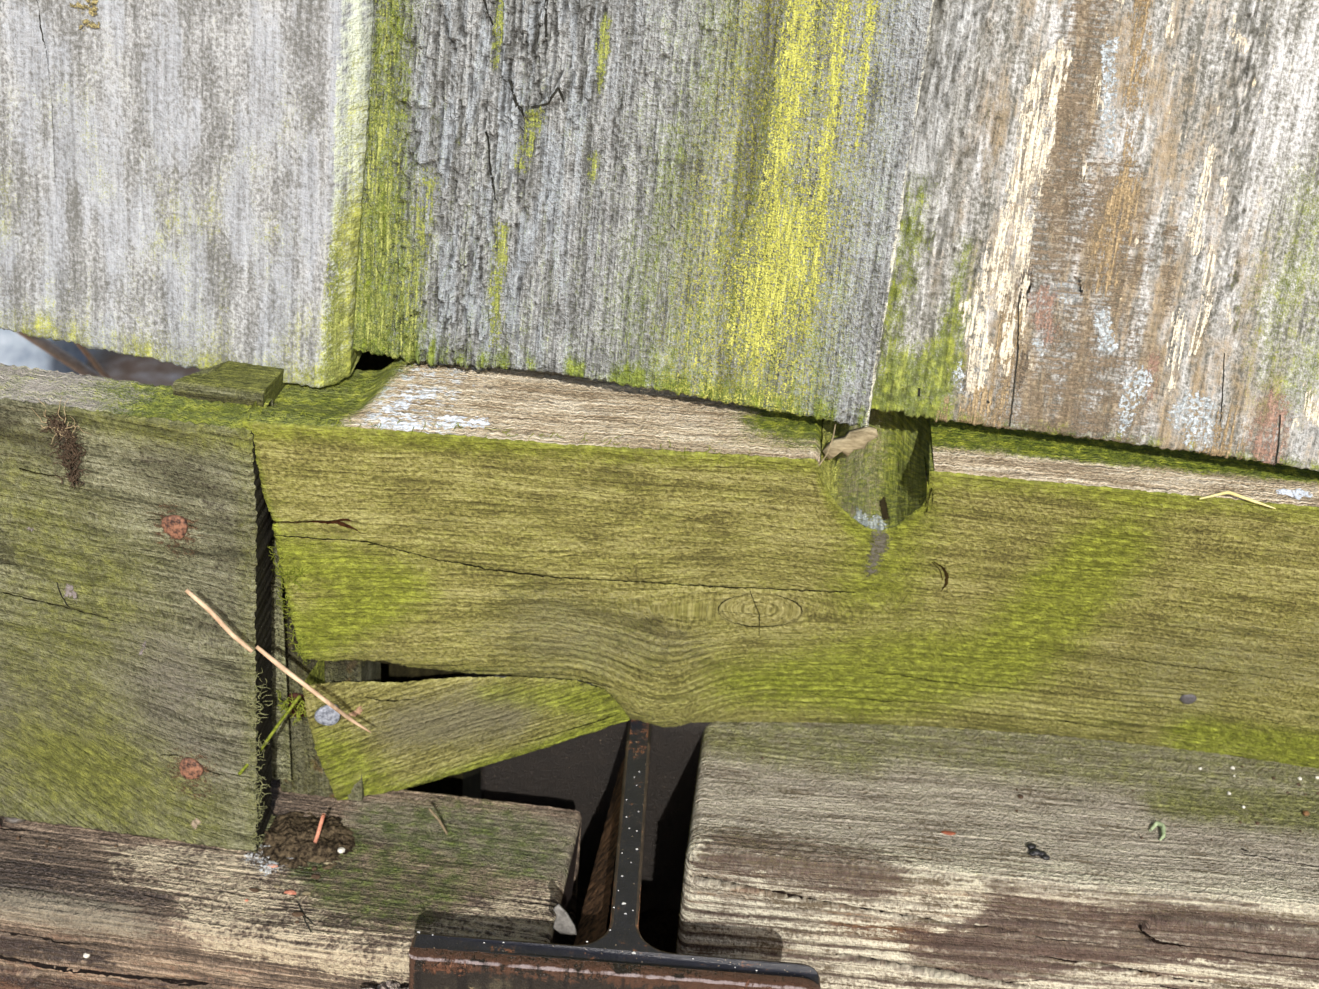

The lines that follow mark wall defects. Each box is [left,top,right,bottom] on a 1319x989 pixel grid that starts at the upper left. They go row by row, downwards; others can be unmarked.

crack [274,519,856,636]
crack [366,694,433,702]
crack [487,674,620,749]
crack [699,876,932,919]
crack [835,924,1319,989]